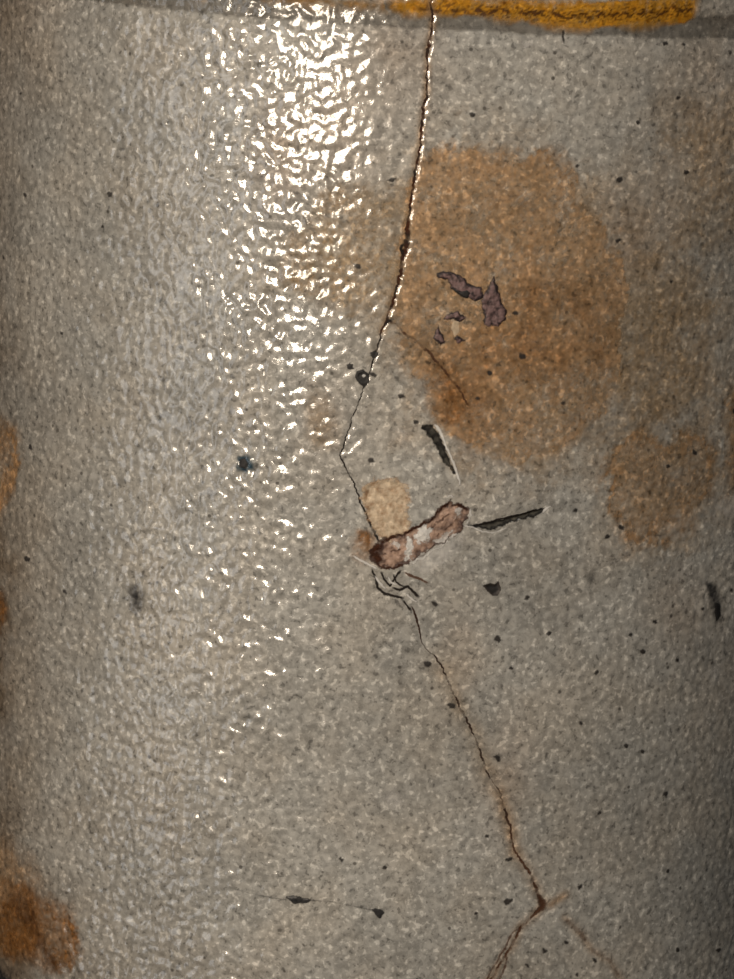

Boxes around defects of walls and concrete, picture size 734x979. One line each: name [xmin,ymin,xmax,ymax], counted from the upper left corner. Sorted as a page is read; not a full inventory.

crack [339,5,434,541]
peeling [433,311,466,345]
peeling [437,271,507,326]
crack [424,348,468,404]
spalling [421,425,461,485]
spalling [359,478,551,570]
crack [354,556,446,675]
crack [455,697,546,979]
rust [0,880,79,970]